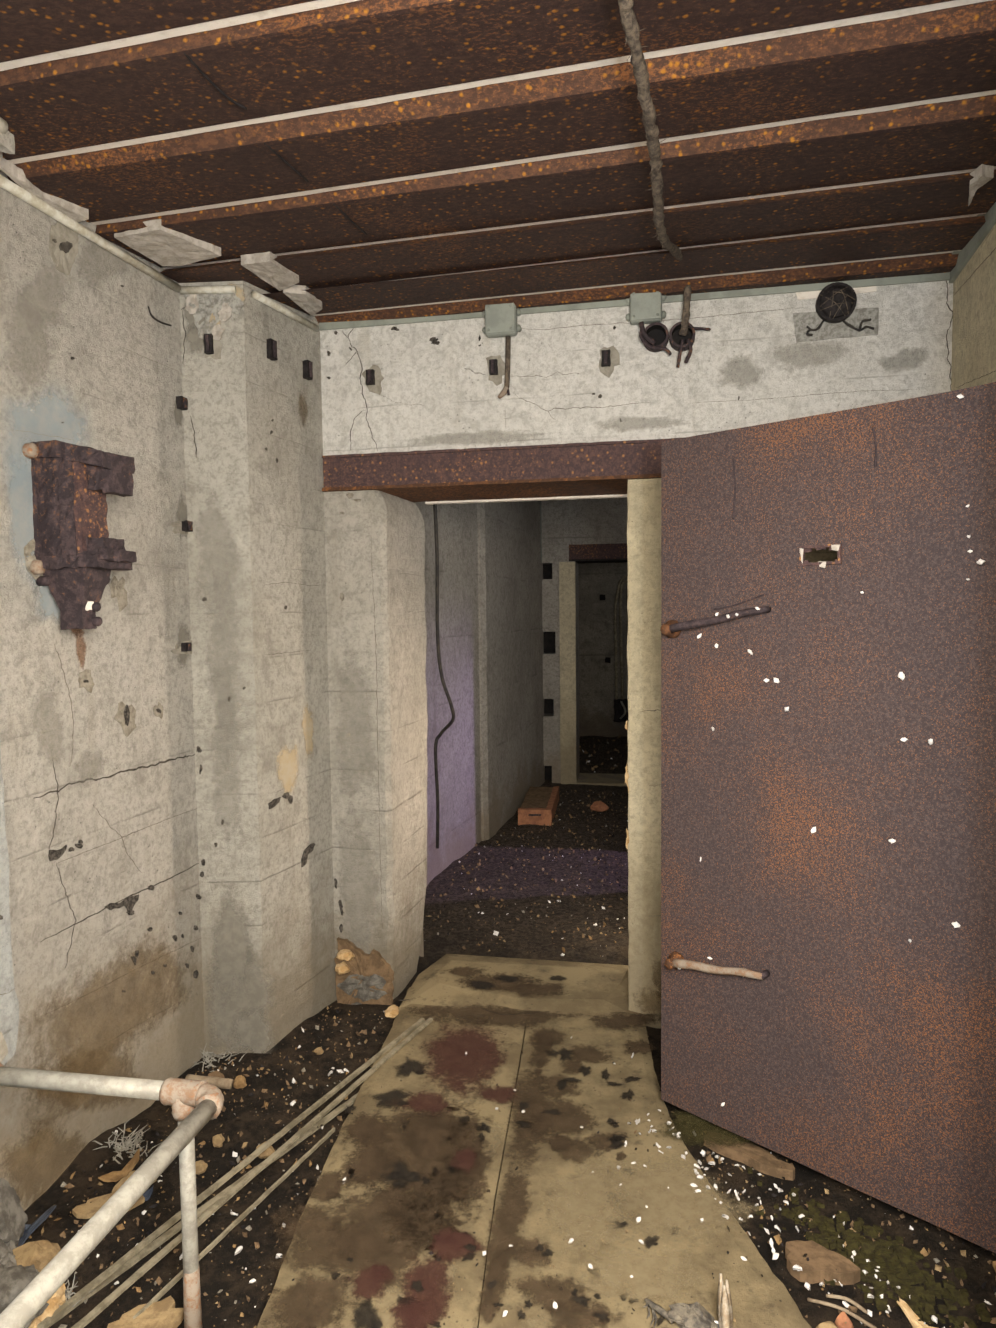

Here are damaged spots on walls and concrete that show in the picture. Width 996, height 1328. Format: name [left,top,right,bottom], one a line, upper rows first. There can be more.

crack [342,328,421,450]
crack [34,648,199,968]
peeling [337,974,387,1005]
water stain [272,966,753,1328]